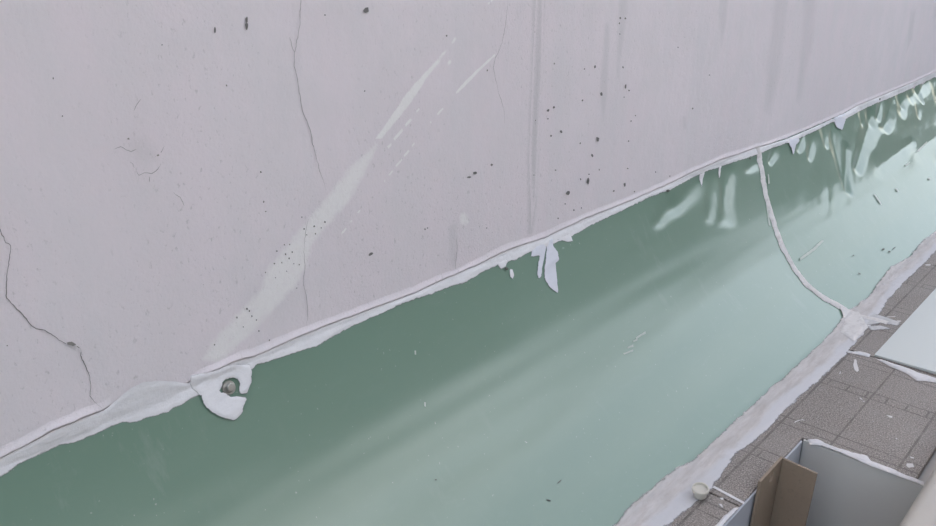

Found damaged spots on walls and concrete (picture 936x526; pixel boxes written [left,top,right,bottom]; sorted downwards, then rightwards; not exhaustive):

crack [289,4,324,182]
crack [0,229,99,406]